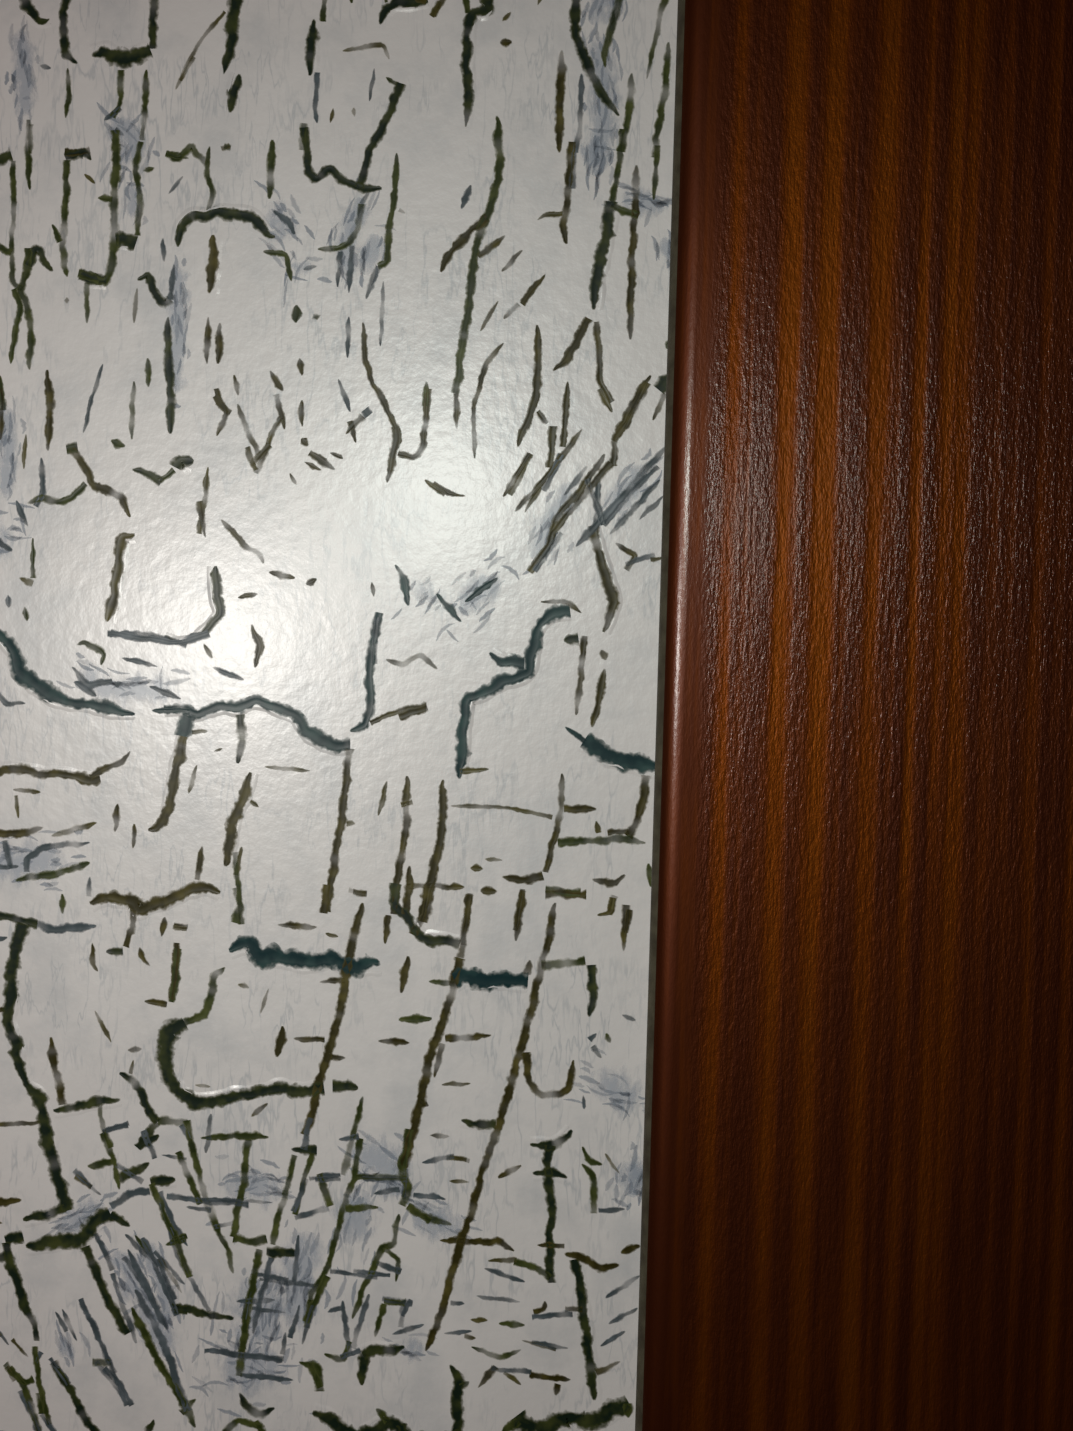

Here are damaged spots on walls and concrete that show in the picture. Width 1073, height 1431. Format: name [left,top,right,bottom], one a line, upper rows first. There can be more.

crack [0,0,670,1431]